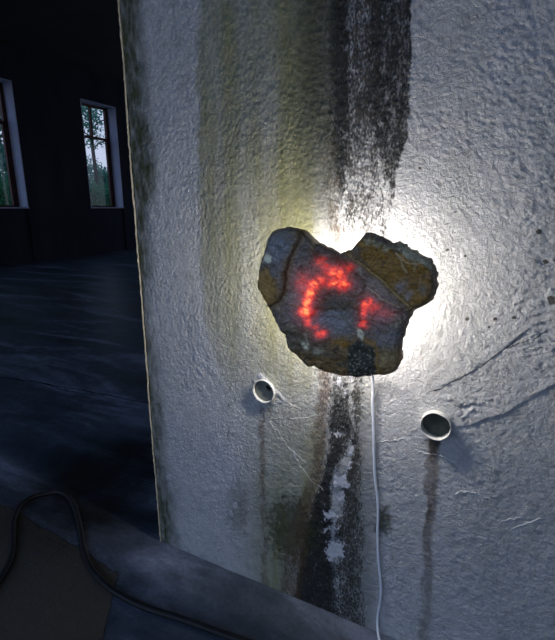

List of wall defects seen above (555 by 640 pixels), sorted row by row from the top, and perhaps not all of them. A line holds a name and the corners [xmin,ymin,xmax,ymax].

water stain [306,0,412,248]
crack [433,330,547,391]
water stain [273,370,365,626]